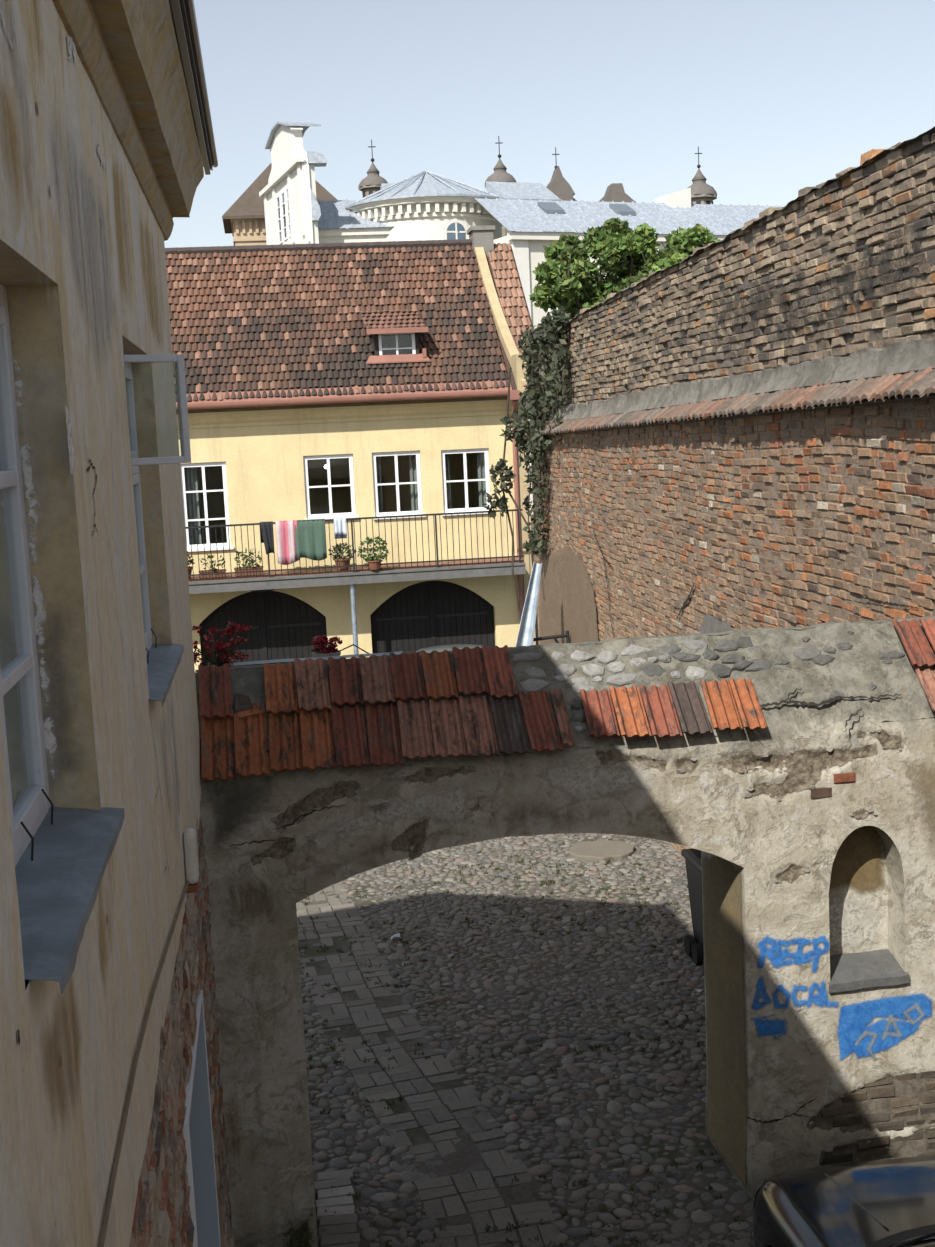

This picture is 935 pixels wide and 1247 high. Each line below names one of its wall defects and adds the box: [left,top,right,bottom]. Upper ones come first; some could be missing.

leakage [55,139,160,360]
crack [86,459,99,537]
peeling [14,359,57,779]
crack [736,688,901,735]
spalling [717,729,903,801]
spalling [250,780,363,865]
crack [747,1097,817,1123]